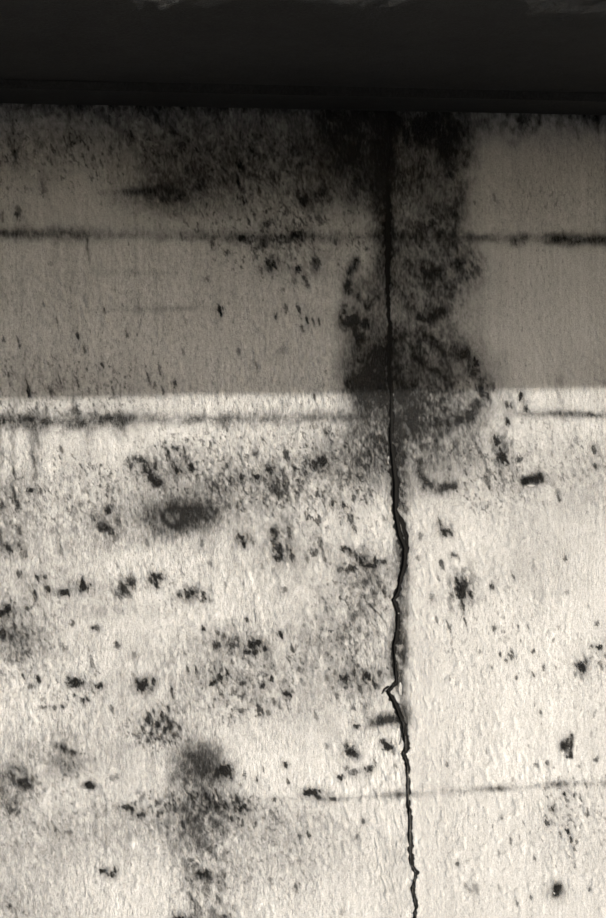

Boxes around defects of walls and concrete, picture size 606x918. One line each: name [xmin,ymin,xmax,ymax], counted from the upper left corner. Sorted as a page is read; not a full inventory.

leakage [280,110,491,532]
leakage [0,405,136,429]
leakage [126,439,197,487]
leakage [140,488,217,535]
crack [371,111,419,918]
leakage [33,575,91,598]
leakage [341,545,386,593]
leakage [454,577,473,624]
leakage [65,677,90,704]
leakage [209,670,292,718]
leakage [339,611,409,729]
leakage [156,744,249,853]